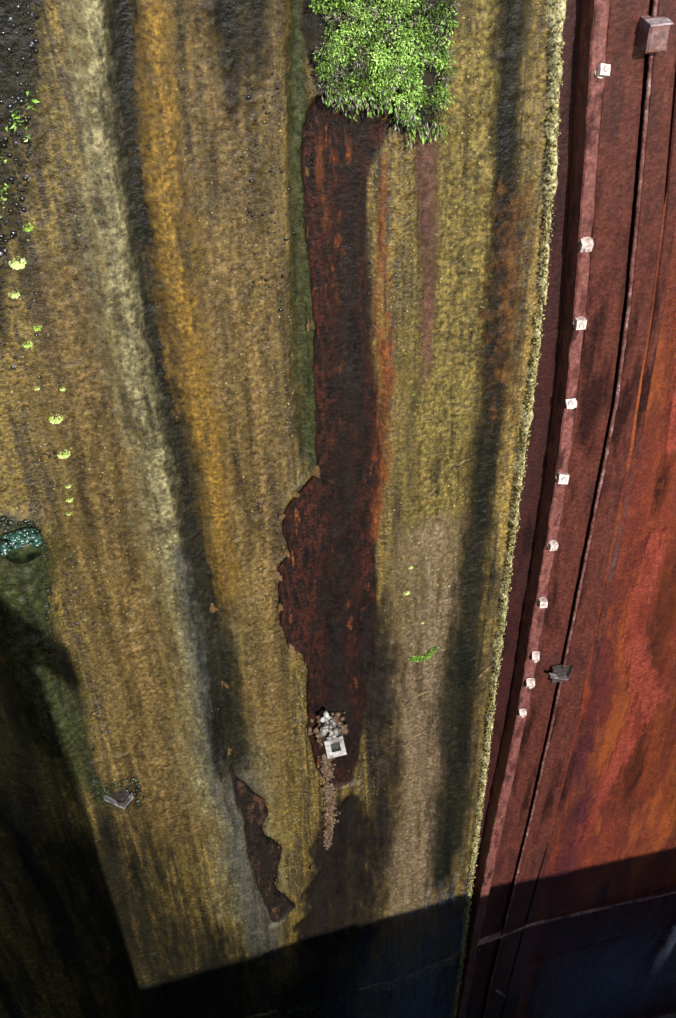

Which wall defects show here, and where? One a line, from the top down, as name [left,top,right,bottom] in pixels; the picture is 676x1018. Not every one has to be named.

leakage [0,0,45,250]
leakage [18,0,277,1018]
peeling [274,88,392,788]
leakage [288,0,528,986]